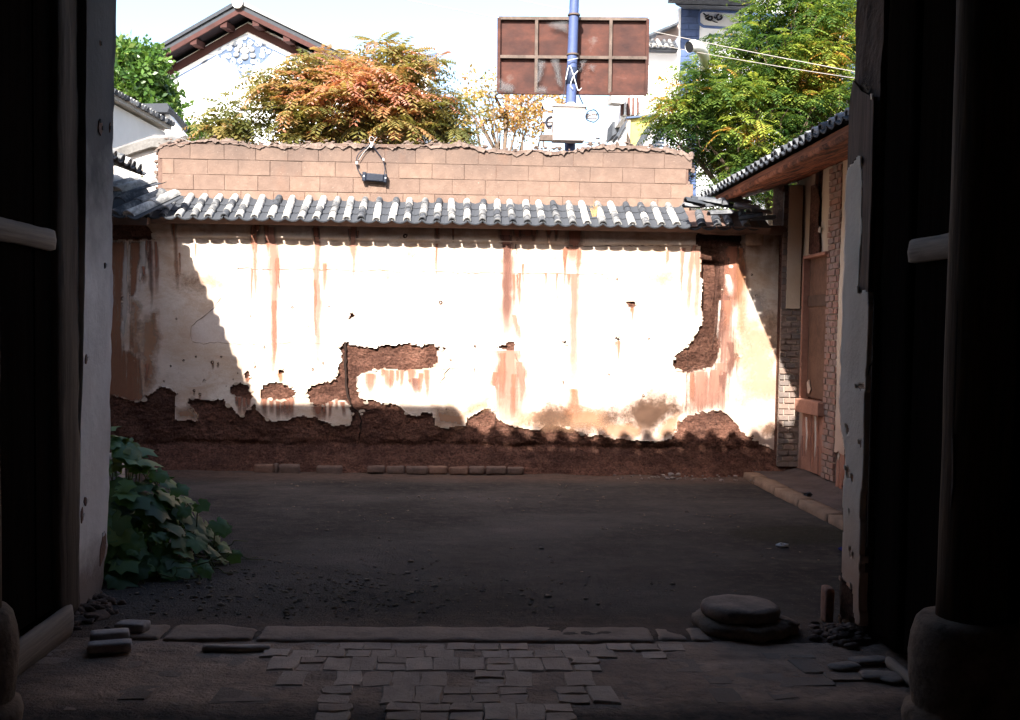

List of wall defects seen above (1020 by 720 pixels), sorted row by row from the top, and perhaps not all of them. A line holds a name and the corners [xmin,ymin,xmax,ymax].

flaking render [672,233,741,373]
flaking render [109,342,786,478]